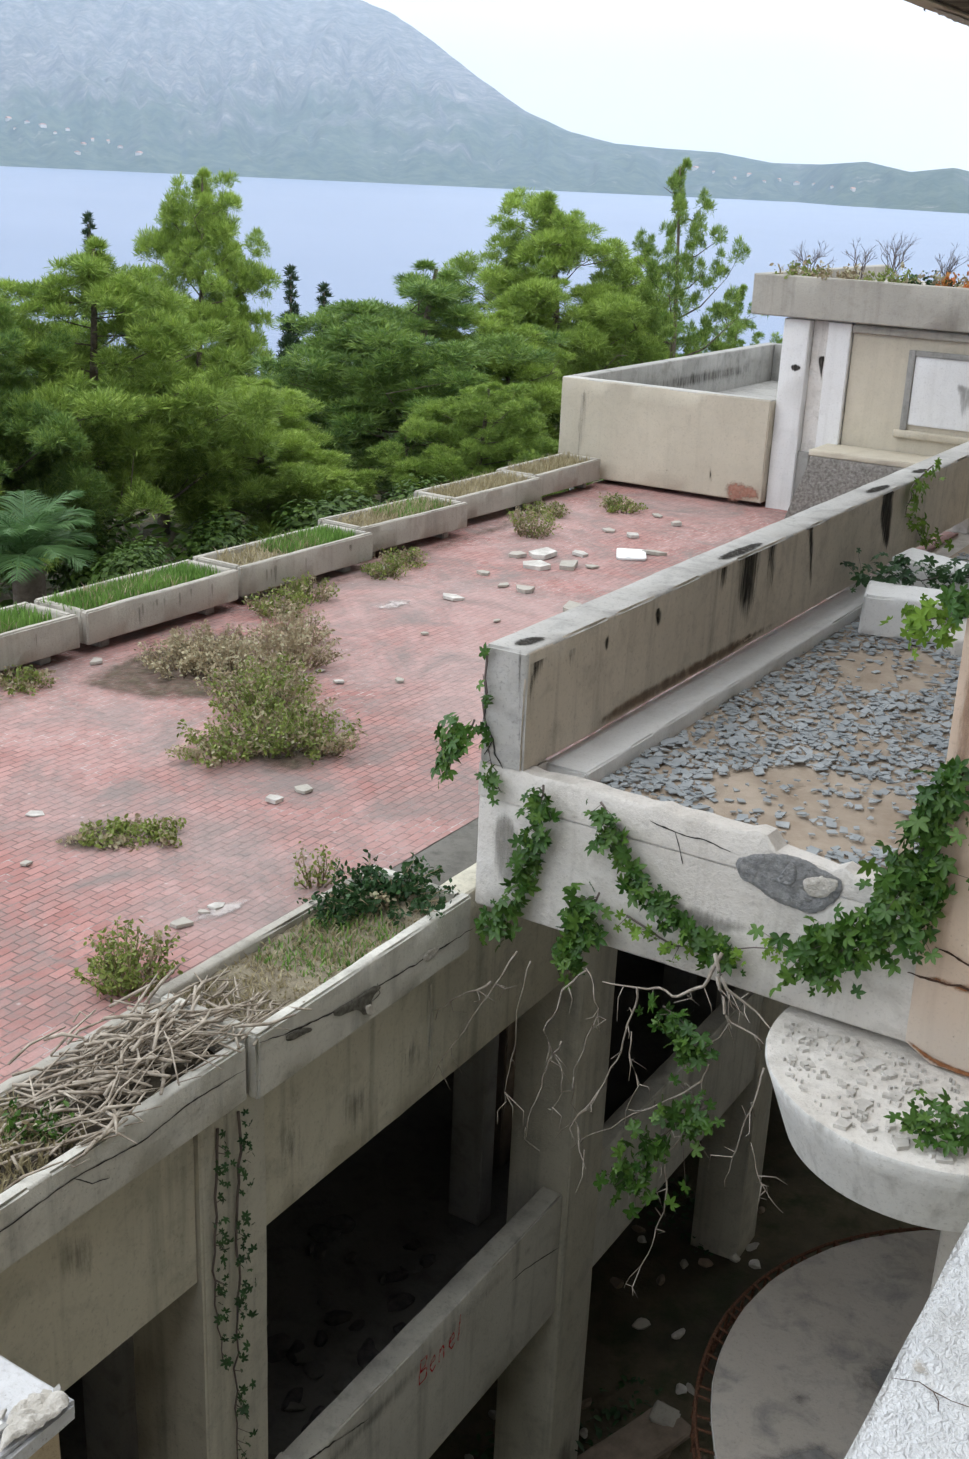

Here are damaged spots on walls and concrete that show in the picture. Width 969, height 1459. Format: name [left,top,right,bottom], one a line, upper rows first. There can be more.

water stain [937,0,969,14]
peeling [728,483,758,501]
water stain [866,485,894,547]
crack [651,821,730,864]
spalling [736,853,842,913]
crack [907,947,969,991]
spalling [0,1384,69,1452]